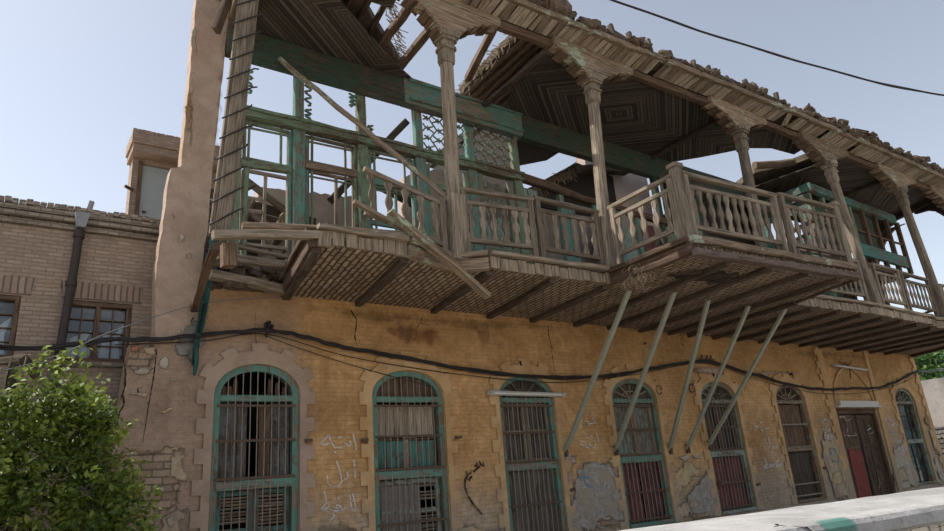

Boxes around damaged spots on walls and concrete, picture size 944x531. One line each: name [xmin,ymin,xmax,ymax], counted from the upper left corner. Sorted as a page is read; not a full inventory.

flaking render [125,344,169,375]
crack [114,349,157,447]
flaking render [117,446,188,530]
flaking render [674,454,711,519]
flaking render [822,432,850,501]